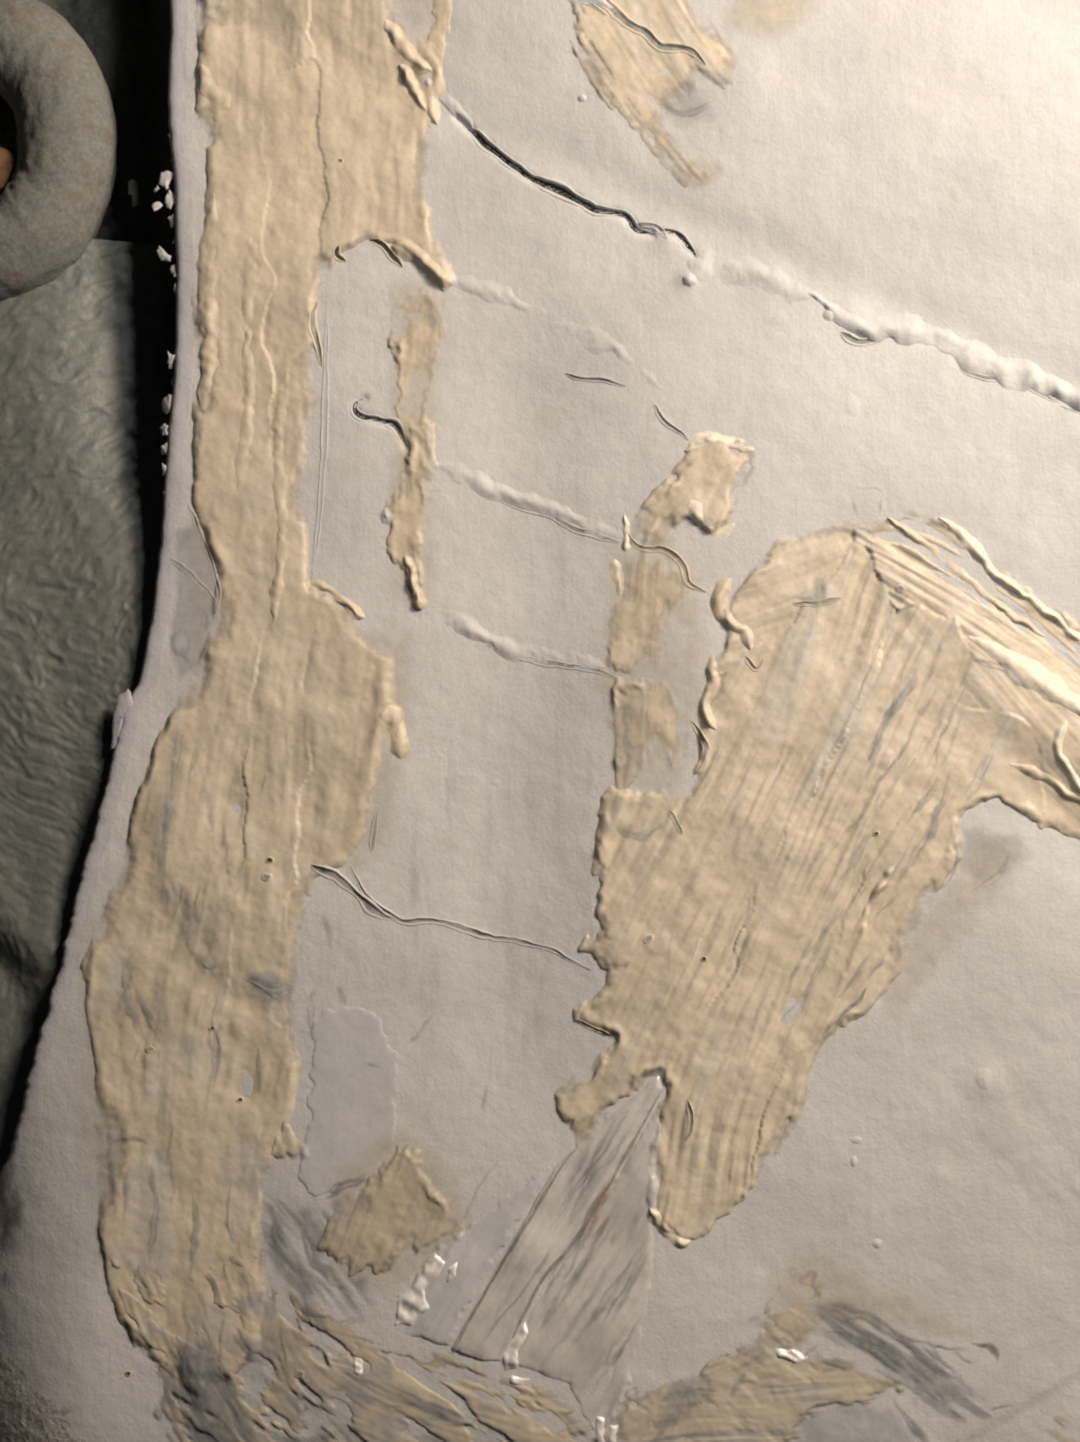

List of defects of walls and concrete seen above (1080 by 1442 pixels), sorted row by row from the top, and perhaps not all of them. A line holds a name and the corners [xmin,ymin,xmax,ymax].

peeling [128,135,177,295]
crack [459,120,697,257]
peeling [160,352,175,494]
peeling [110,689,133,751]
spalling [261,856,275,882]
crack [311,811,591,971]